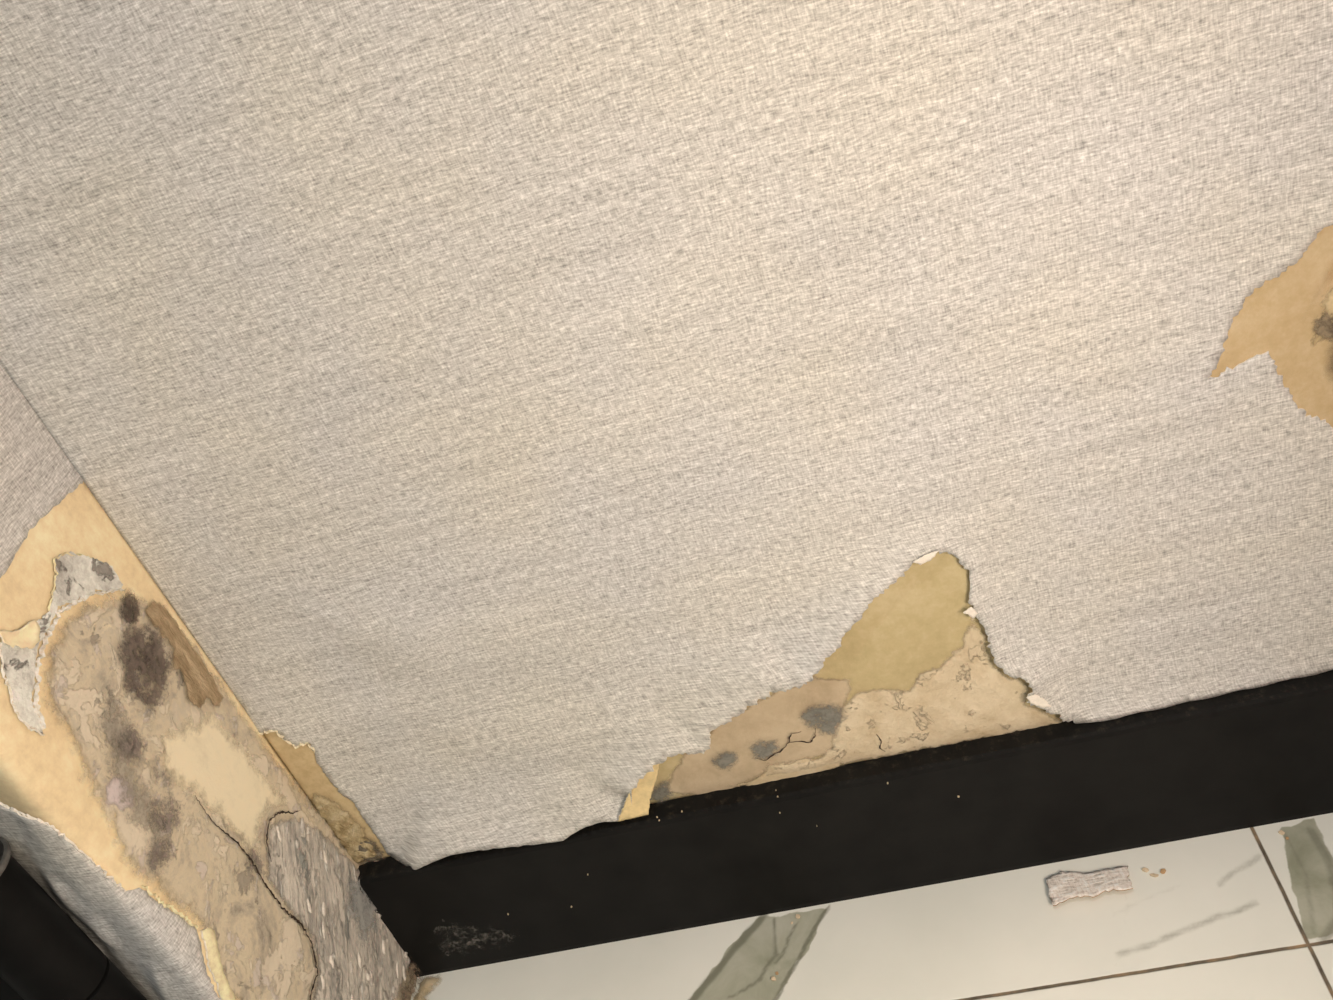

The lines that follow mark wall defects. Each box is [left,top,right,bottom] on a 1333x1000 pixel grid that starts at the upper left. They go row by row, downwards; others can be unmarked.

water stain [1314,313,1333,339]
water stain [100,593,181,873]
water stain [801,705,843,734]
spalling [667,619,1060,795]
water stain [712,752,738,769]
water stain [751,741,779,759]
spalling [0,551,413,1000]